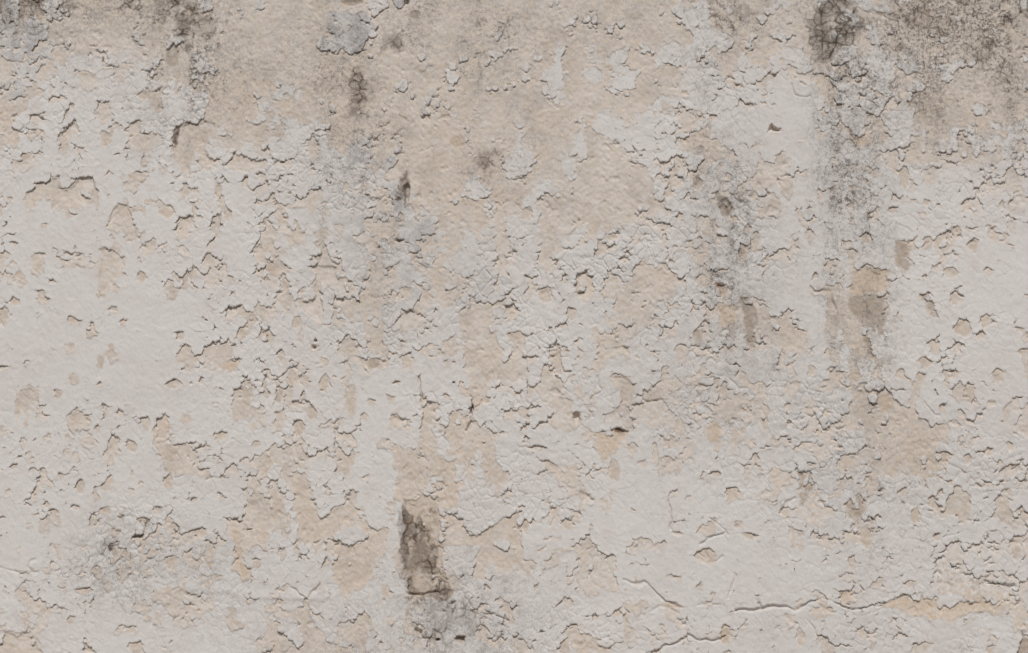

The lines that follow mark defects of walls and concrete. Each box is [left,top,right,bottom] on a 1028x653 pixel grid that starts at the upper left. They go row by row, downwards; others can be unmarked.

leakage [810,0,862,56]
peeling [0,0,1028,430]
peeling [413,240,971,549]
peeling [70,479,85,511]
peeling [63,406,137,492]
peeling [131,577,206,629]
peeling [109,369,390,596]
peeling [263,594,383,653]
peeling [376,394,595,653]
peeling [625,531,682,556]
peeling [698,548,717,562]
crack [623,517,887,653]